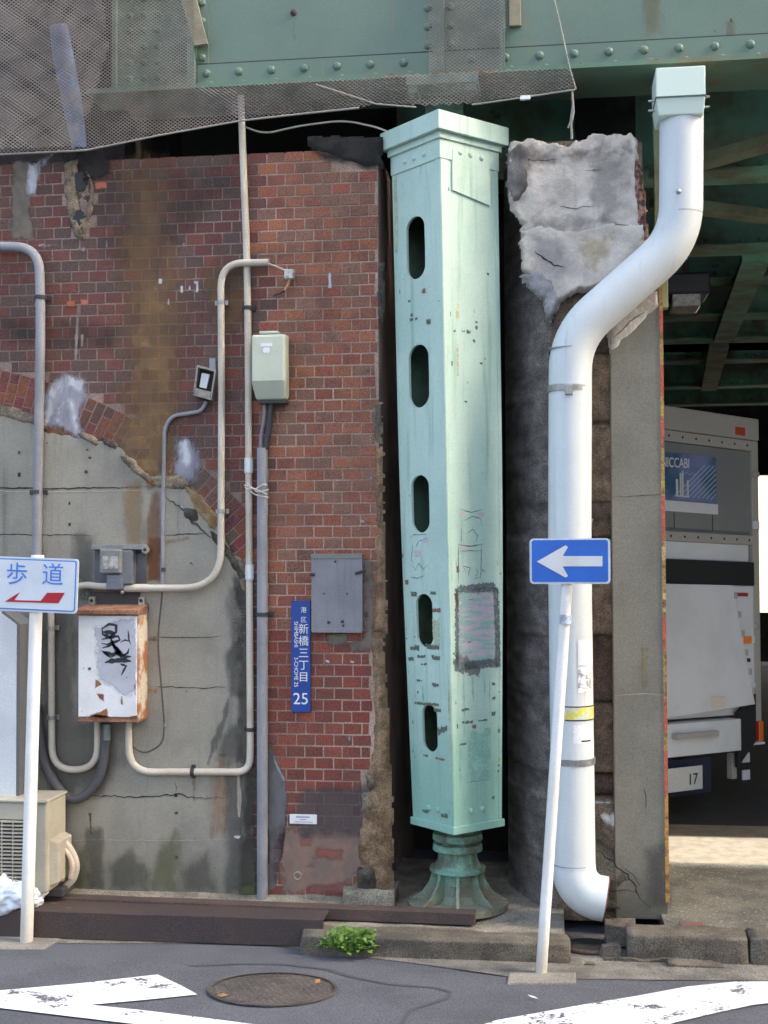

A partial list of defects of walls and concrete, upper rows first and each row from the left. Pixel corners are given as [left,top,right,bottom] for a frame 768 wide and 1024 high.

spalling [64,160,107,241]
leakage [120,270,198,480]
spalling [0,404,49,431]
leakage [44,375,86,438]
spalling [78,432,246,591]
peeling [408,643,440,665]
rust [90,680,109,718]
peeling [414,679,441,712]
crack [93,784,223,799]
crack [597,850,650,907]